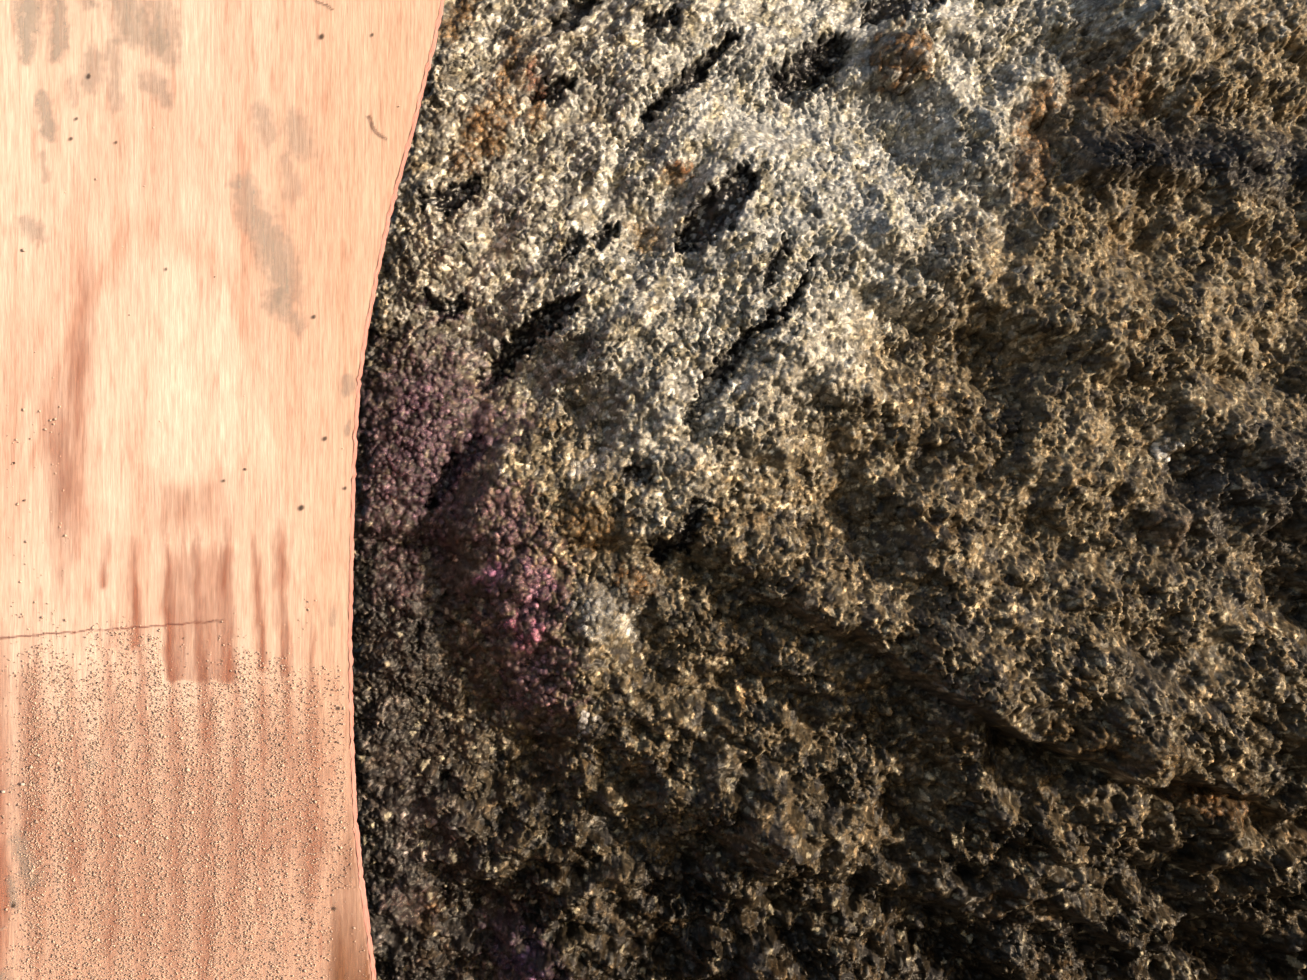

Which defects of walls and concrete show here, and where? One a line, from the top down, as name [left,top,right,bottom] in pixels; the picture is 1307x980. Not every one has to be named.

leakage [164,577,172,678]
leakage [256,578,264,669]